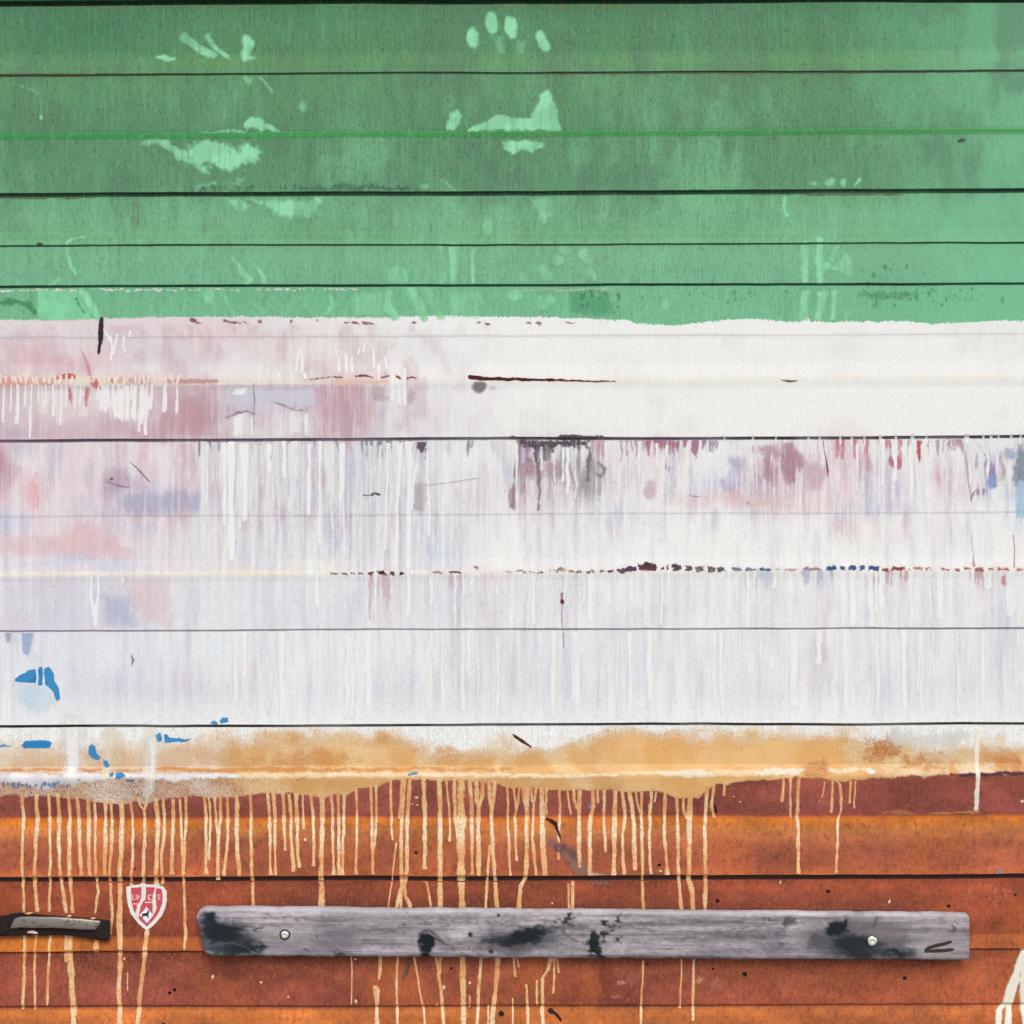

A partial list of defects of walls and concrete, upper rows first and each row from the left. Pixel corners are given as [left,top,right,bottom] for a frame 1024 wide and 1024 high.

damp [0,373,181,438]
damp [471,381,497,394]
damp [508,433,726,511]
damp [719,433,1024,526]
damp [197,343,431,722]
damp [5,633,34,657]
damp [424,569,480,721]
damp [522,573,581,723]
damp [599,566,986,723]
peeling [13,666,60,715]
rust [0,744,513,777]
rust [859,735,1024,780]